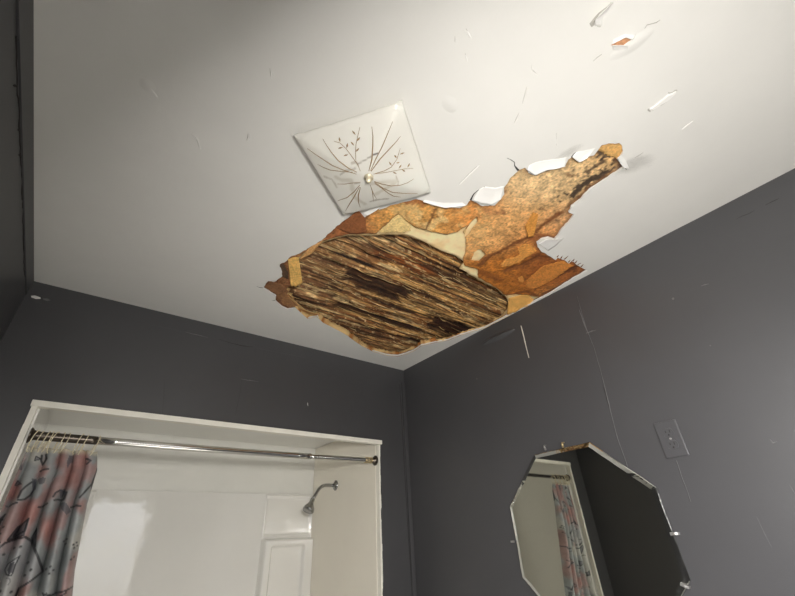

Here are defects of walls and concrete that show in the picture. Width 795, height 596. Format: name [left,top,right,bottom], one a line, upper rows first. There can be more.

peeling [590,2,613,27]
spalling [612,34,635,50]
crack [13,36,25,276]
peeling [598,143,623,159]
peeling [378,215,411,233]
peeling [500,244,537,267]
peeling [518,260,574,289]